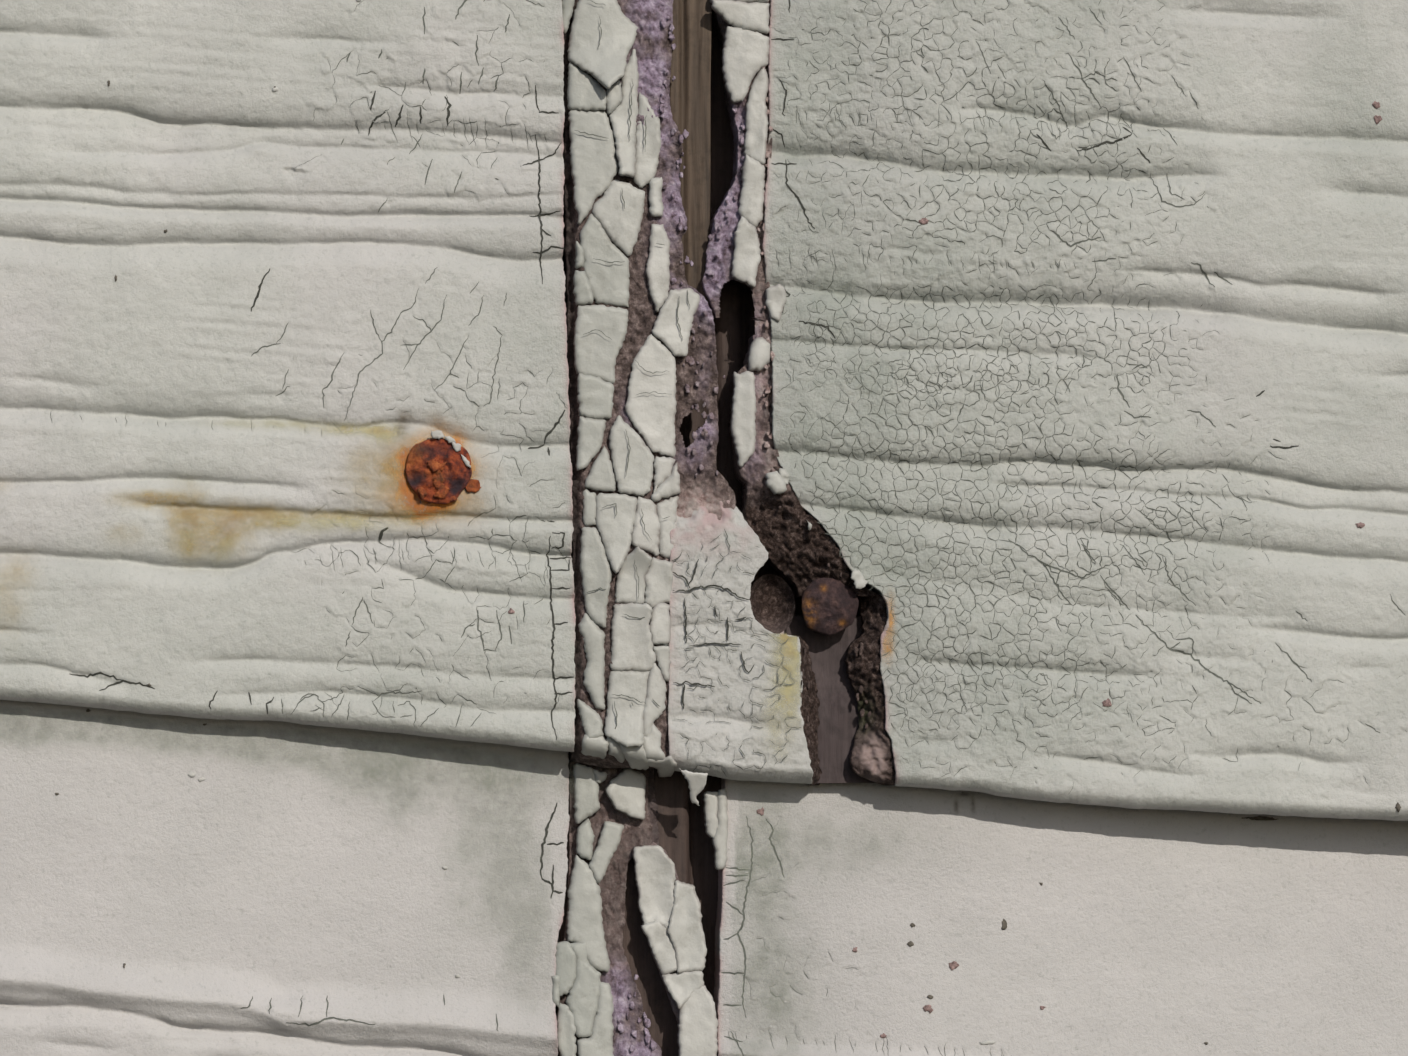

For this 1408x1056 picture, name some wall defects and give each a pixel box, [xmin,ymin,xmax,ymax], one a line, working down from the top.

crack [295,0,647,284]
peeling [710,0,787,322]
crack [71,672,155,691]
rust [340,426,459,521]
crack [209,268,801,774]
peeling [552,0,729,1056]
spalling [730,337,896,785]